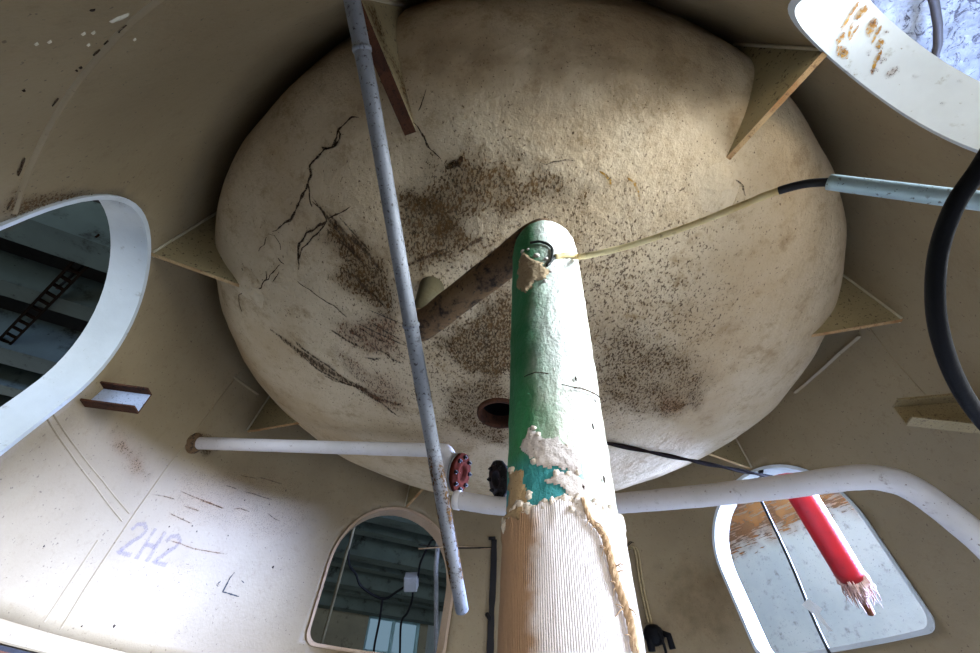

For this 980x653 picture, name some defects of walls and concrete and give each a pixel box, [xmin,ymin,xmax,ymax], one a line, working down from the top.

rust [832,1,898,79]
crack [239,116,359,316]
peeling [516,248,553,293]
damp [296,342,399,417]
peeling [503,425,591,521]